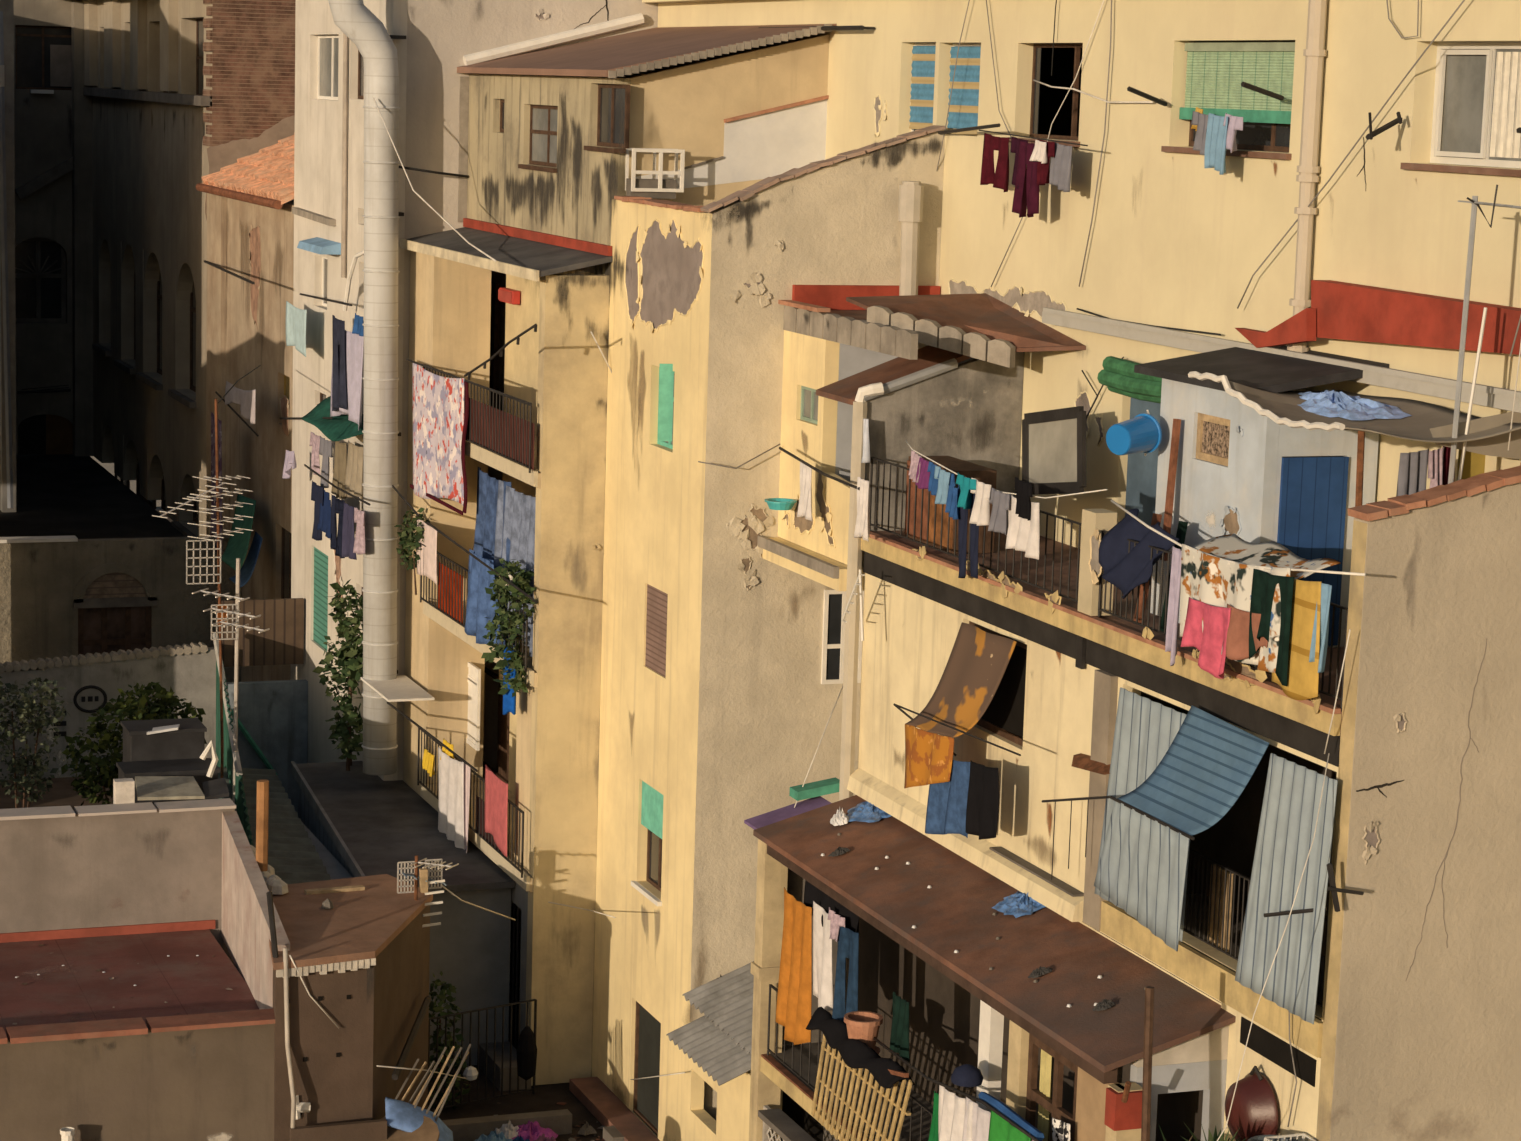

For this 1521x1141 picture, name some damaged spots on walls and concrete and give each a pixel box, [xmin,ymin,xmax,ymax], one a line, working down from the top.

damp [484,97,624,226]
flaking render [624,218,704,333]
crack [1406,638,1487,981]